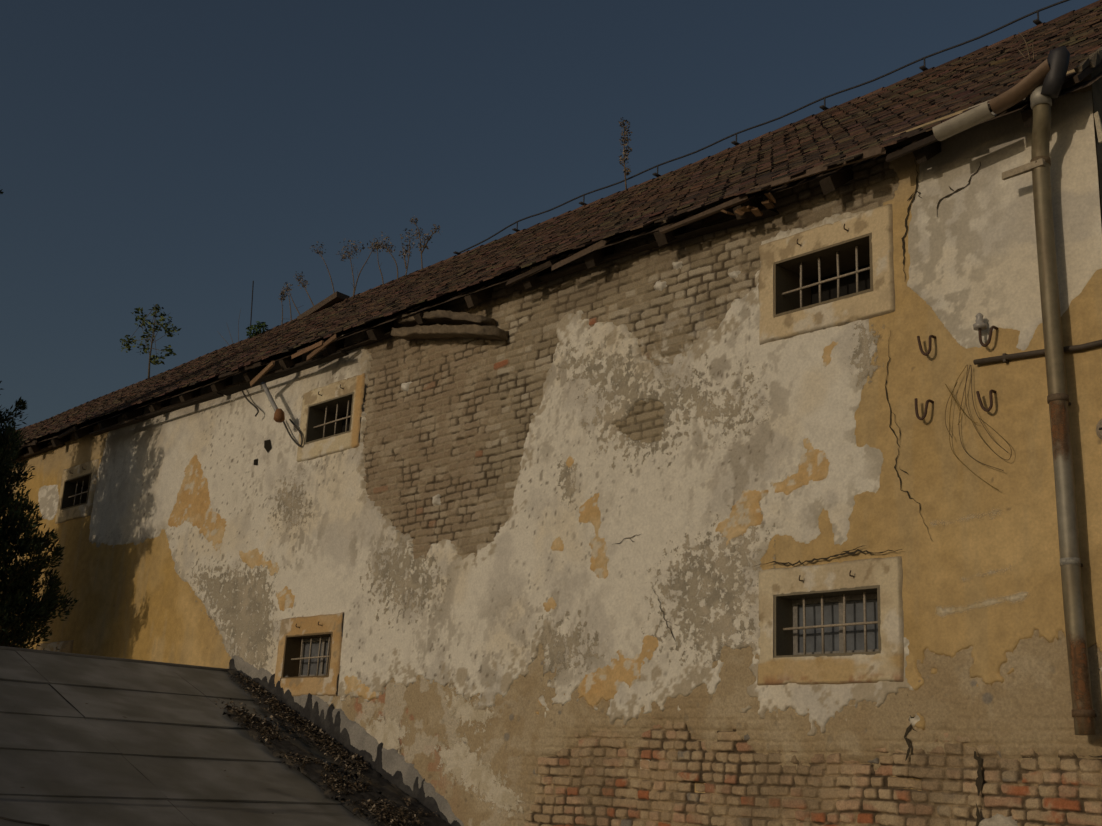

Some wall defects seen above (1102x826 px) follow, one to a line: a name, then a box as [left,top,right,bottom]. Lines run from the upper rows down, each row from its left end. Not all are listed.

peeling [907,96,1042,351]
peeling [1049,65,1102,316]
peeling [89,138,1102,826]
crack [756,546,902,566]
crack [885,330,932,540]
rust [1050,401,1069,459]
rust [1070,639,1093,725]